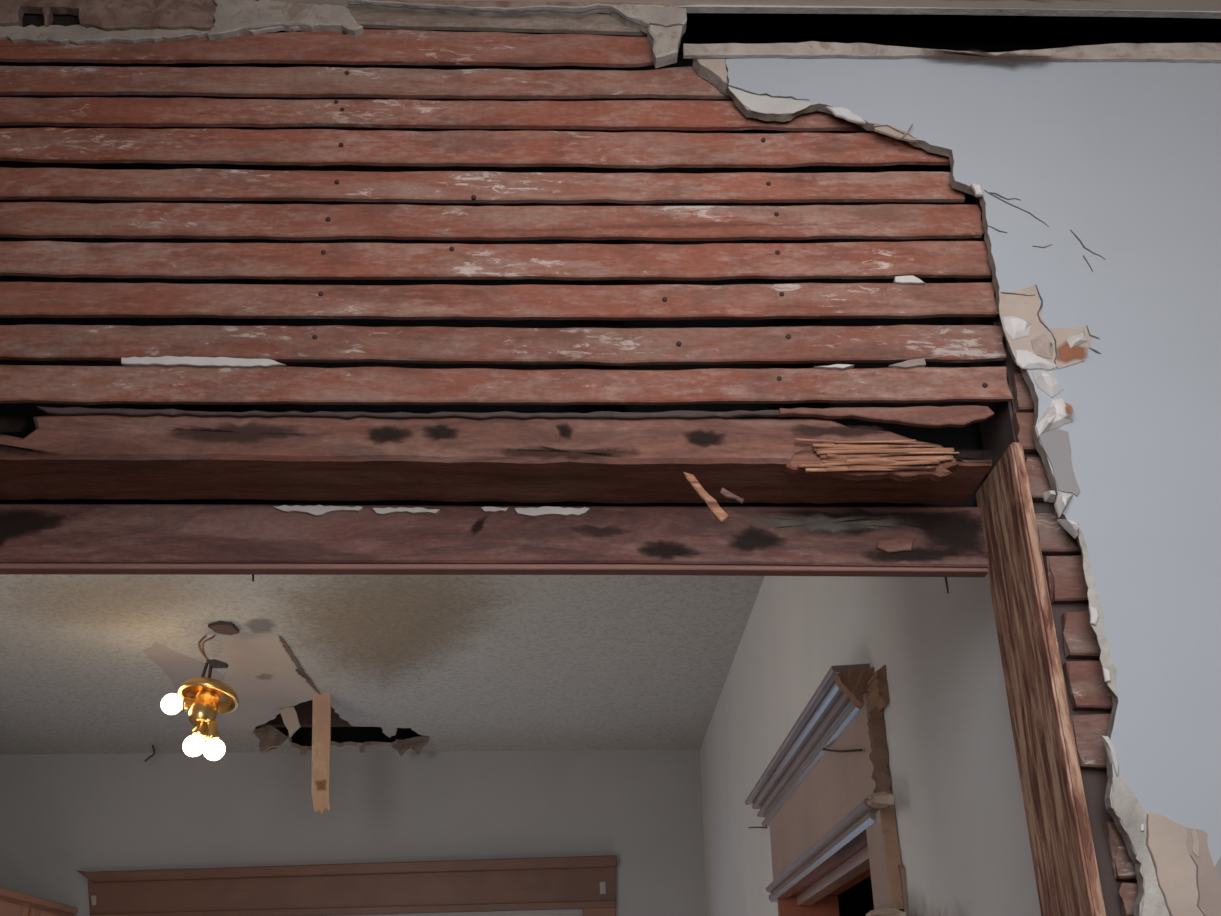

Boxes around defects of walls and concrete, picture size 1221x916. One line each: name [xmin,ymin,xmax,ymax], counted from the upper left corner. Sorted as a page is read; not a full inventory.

flaking render [728,85,918,142]
crack [984,190,1105,272]
flaking render [999,284,1101,371]
leakage [369,427,410,443]
leakage [507,425,634,457]
leakage [687,431,722,446]
peeling [273,505,440,517]
peeling [481,506,590,517]
leakage [640,541,698,558]
leakage [731,528,783,550]
peeling [1038,429,1117,697]
peeling [1101,736,1221,916]